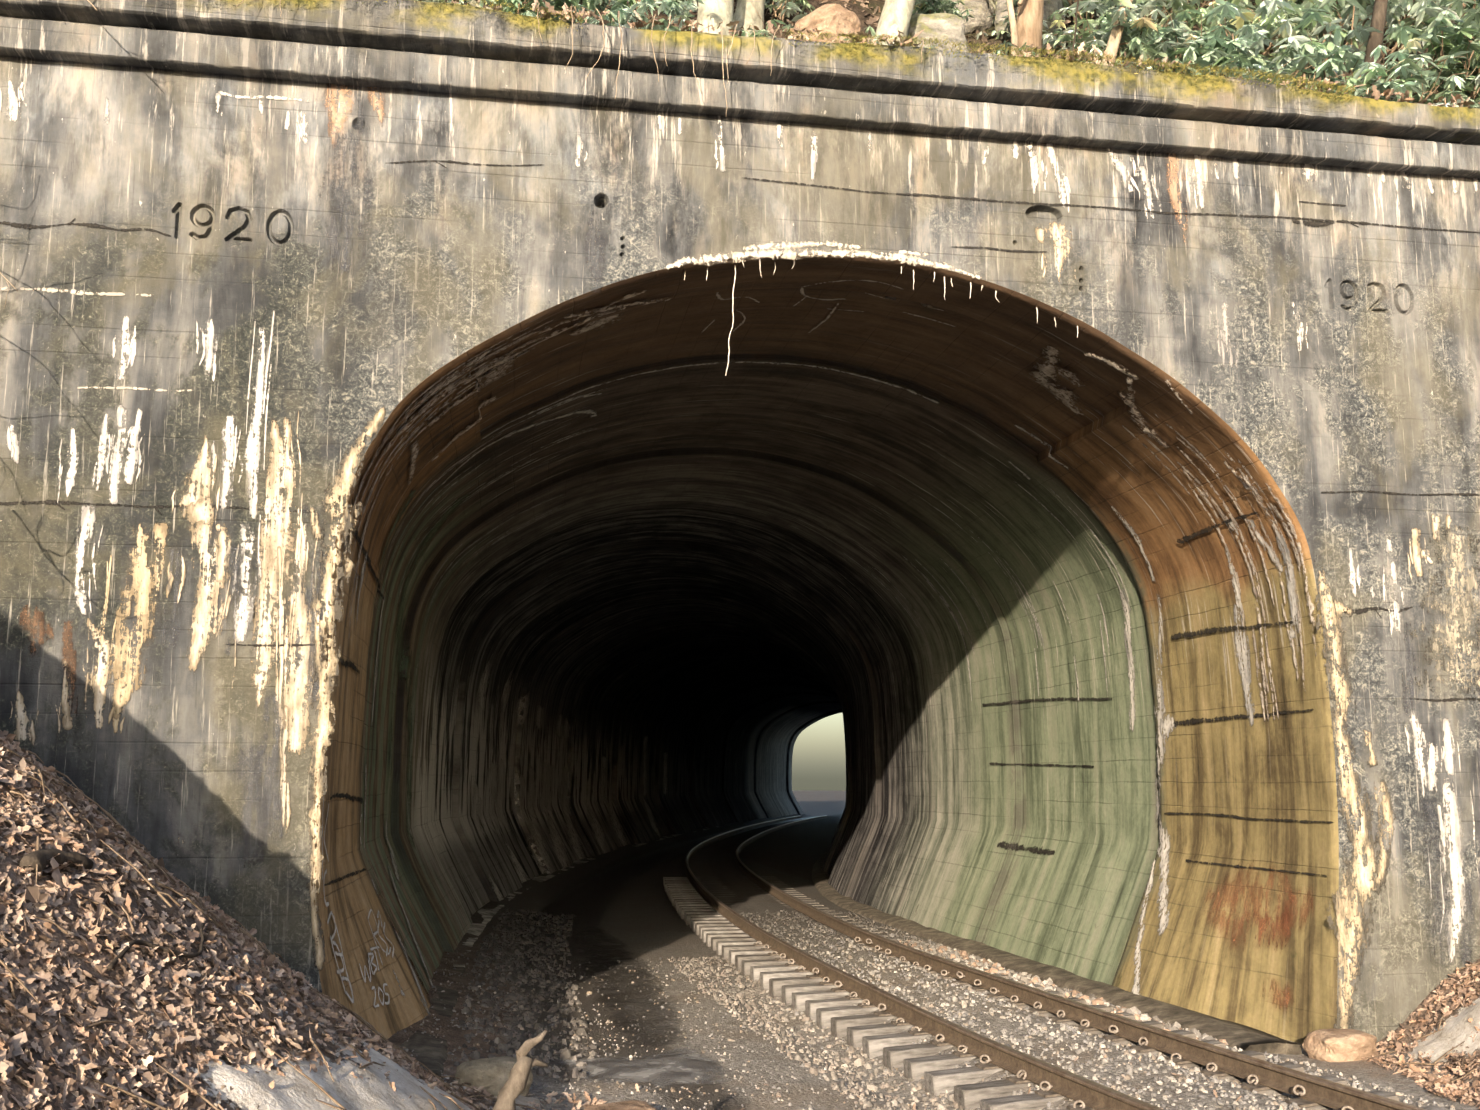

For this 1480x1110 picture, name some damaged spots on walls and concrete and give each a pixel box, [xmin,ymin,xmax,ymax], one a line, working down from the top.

water stain [0,78,27,122]
water stain [215,91,310,145]
water stain [318,95,371,271]
water stain [1300,164,1316,182]
water stain [1367,170,1434,194]
water stain [1450,176,1478,193]
water stain [666,240,981,280]
corrosion [1207,860,1313,947]